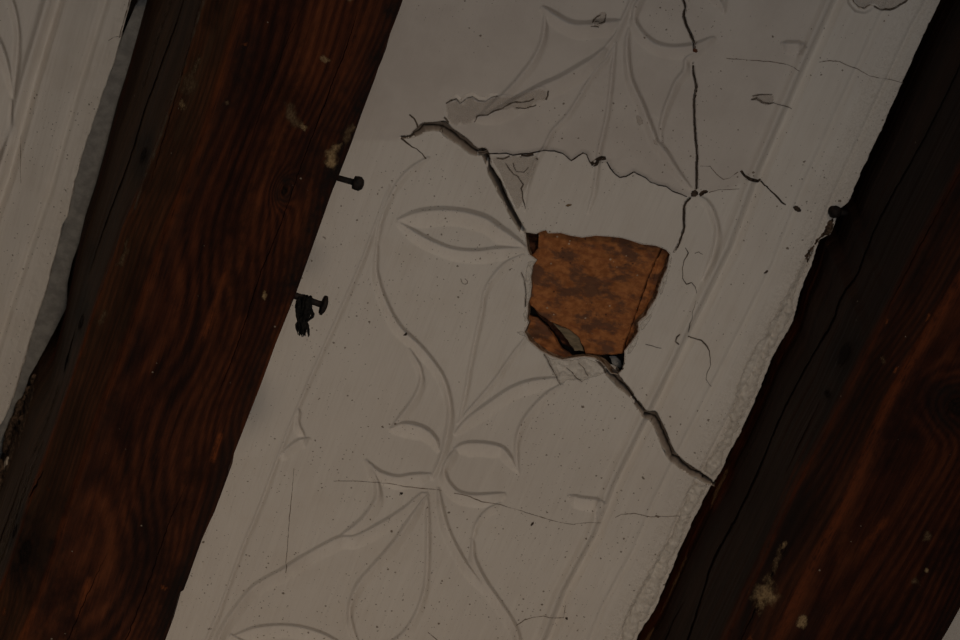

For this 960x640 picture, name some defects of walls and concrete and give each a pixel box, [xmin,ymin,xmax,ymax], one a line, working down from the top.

peeling [446,91,549,122]
crack [401,114,524,231]
crack [646,0,786,386]
flaking render [804,218,836,262]
flaking render [518,230,672,385]
crack [595,358,716,486]